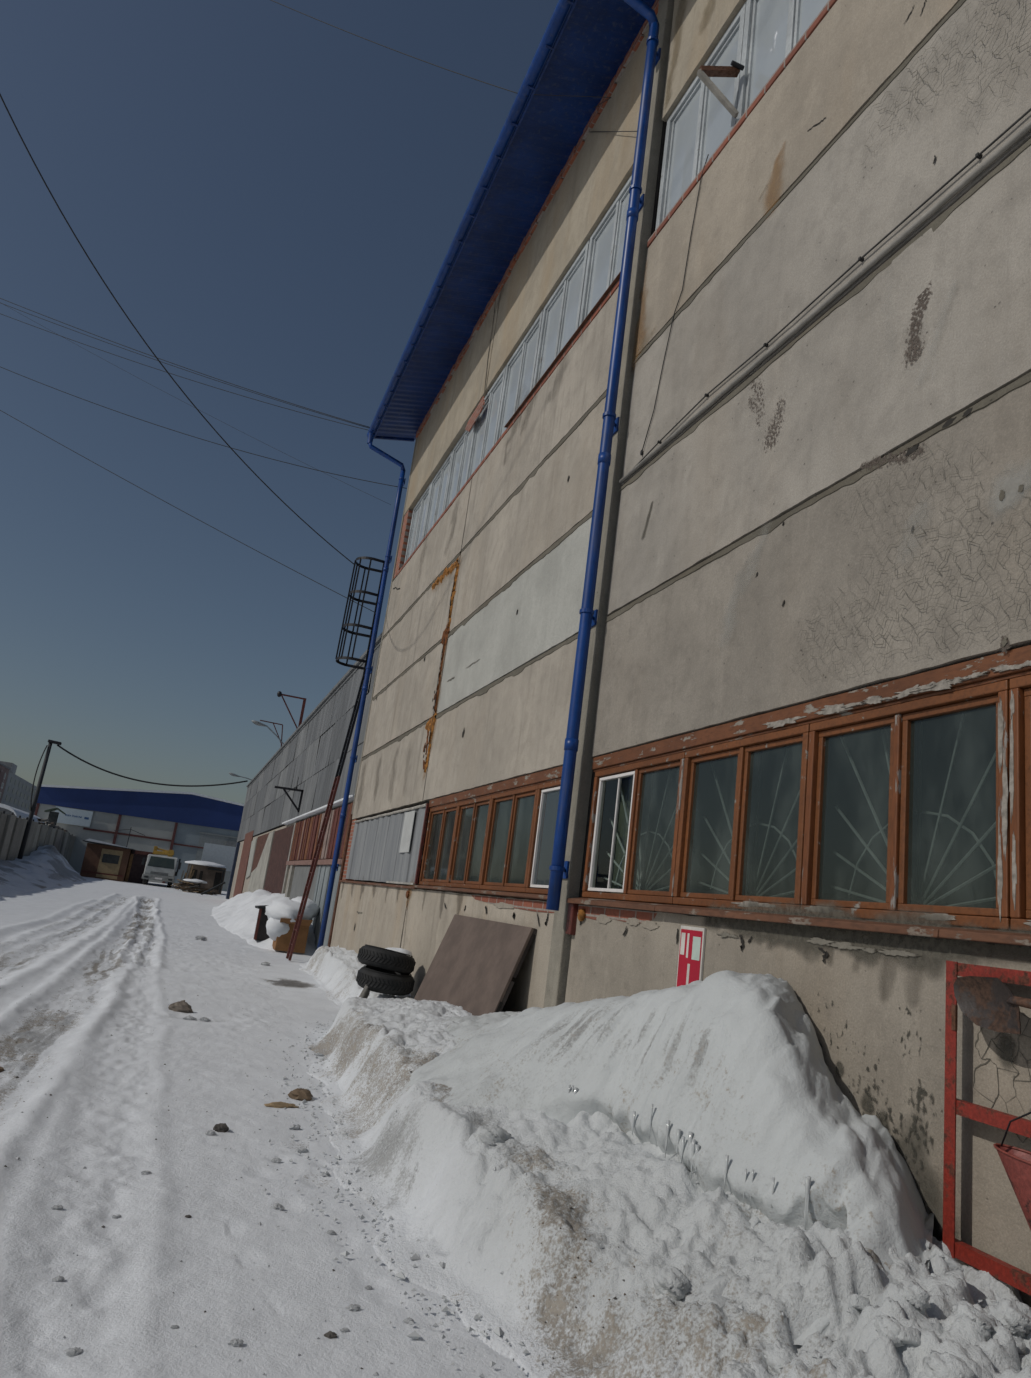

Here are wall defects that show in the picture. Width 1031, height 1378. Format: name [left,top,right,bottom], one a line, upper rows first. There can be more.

crack [861,0,1031,165]
spalling [904,283,932,367]
rust [423,558,459,773]
peeling [762,636,1031,728]
damp [818,1022,943,1241]